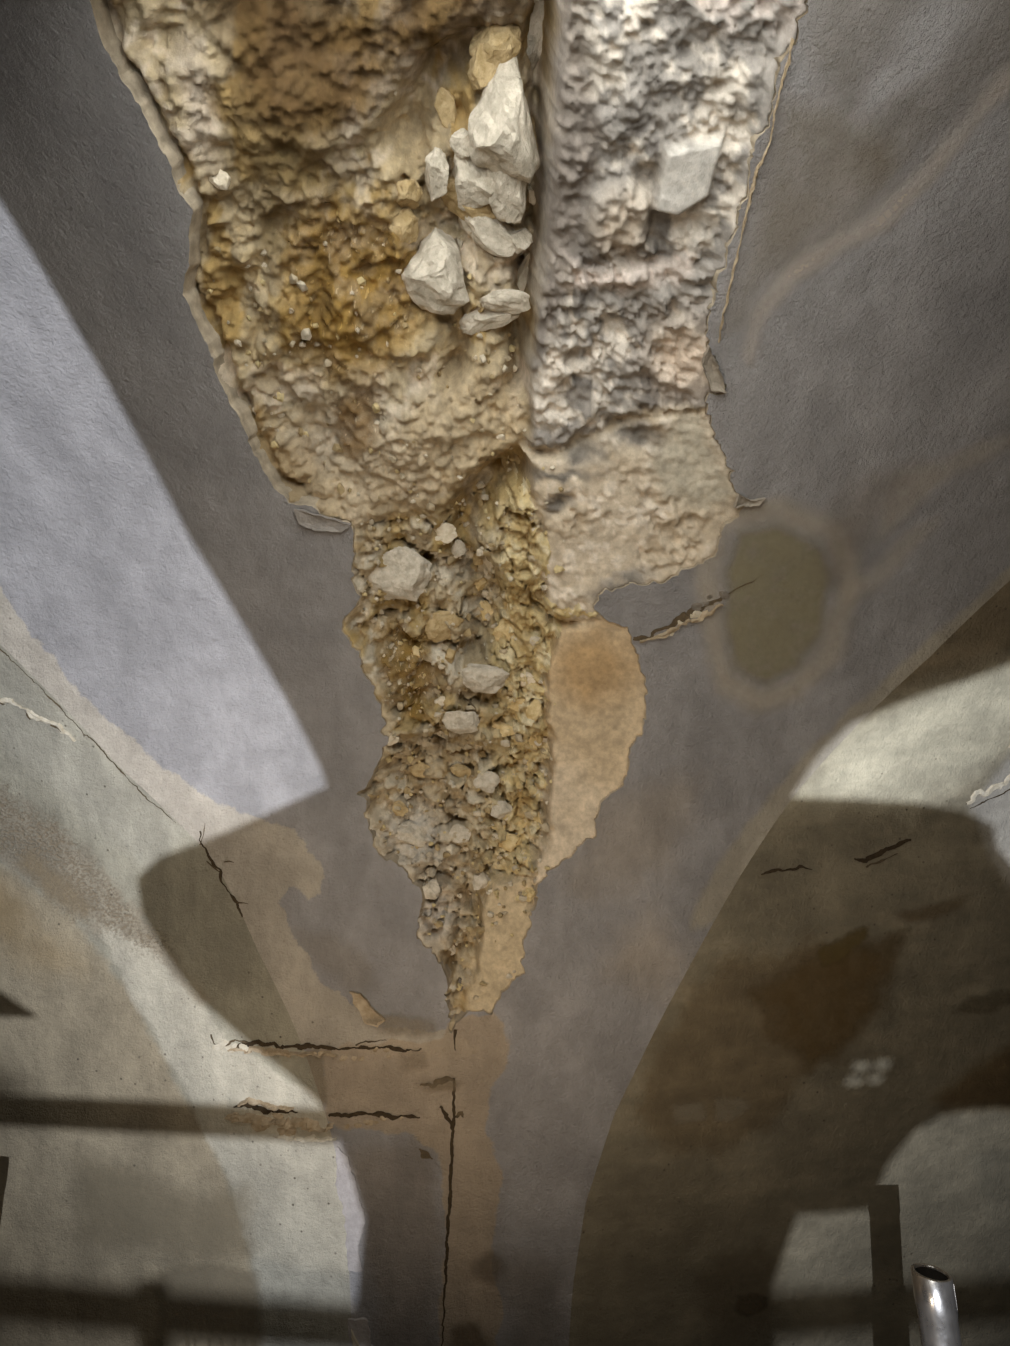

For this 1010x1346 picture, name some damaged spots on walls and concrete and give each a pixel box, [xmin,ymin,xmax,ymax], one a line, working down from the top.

spalling [90,0,812,1034]
crack [633,575,762,643]
crack [0,649,248,917]
crack [966,775,1010,809]
crack [210,1029,464,1346]